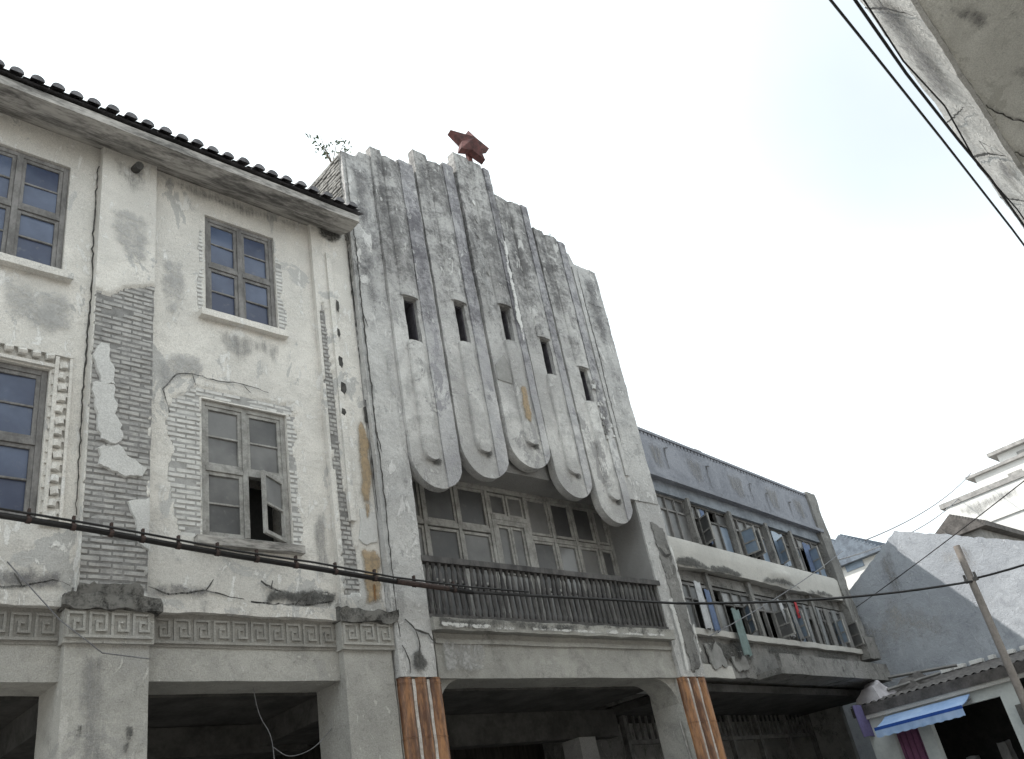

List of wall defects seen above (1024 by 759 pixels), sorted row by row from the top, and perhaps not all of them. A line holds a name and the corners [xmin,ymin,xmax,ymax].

crack [865,0,913,16]
crack [947,104,1024,123]
crack [974,141,1024,158]
crack [75,166,100,515]
flaking render [79,261,202,593]
flaking render [165,387,303,545]
flaking render [320,300,378,595]
crack [149,579,329,606]
spalling [650,522,750,673]